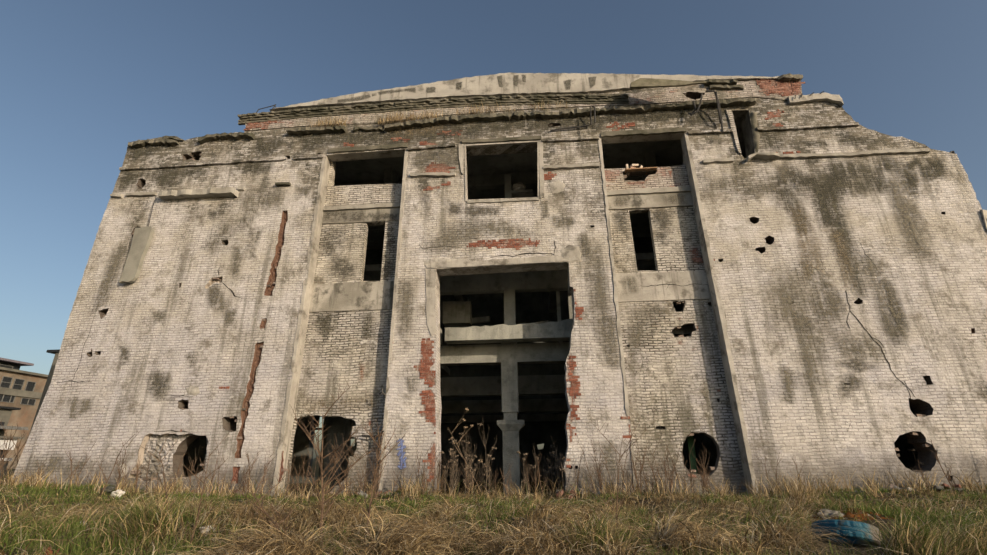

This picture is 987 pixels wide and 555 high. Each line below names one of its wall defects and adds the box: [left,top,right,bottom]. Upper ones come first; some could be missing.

flaking render [754,79,805,97]
spalling [750,109,784,153]
damp [92,246,127,311]
damp [209,286,235,323]
damp [233,231,260,274]
flaking render [466,238,540,250]
damp [710,156,945,404]
crack [845,291,915,399]
flaking render [414,338,436,482]
flaking render [566,356,581,442]
spalling [129,429,209,481]
hole [894,431,937,472]